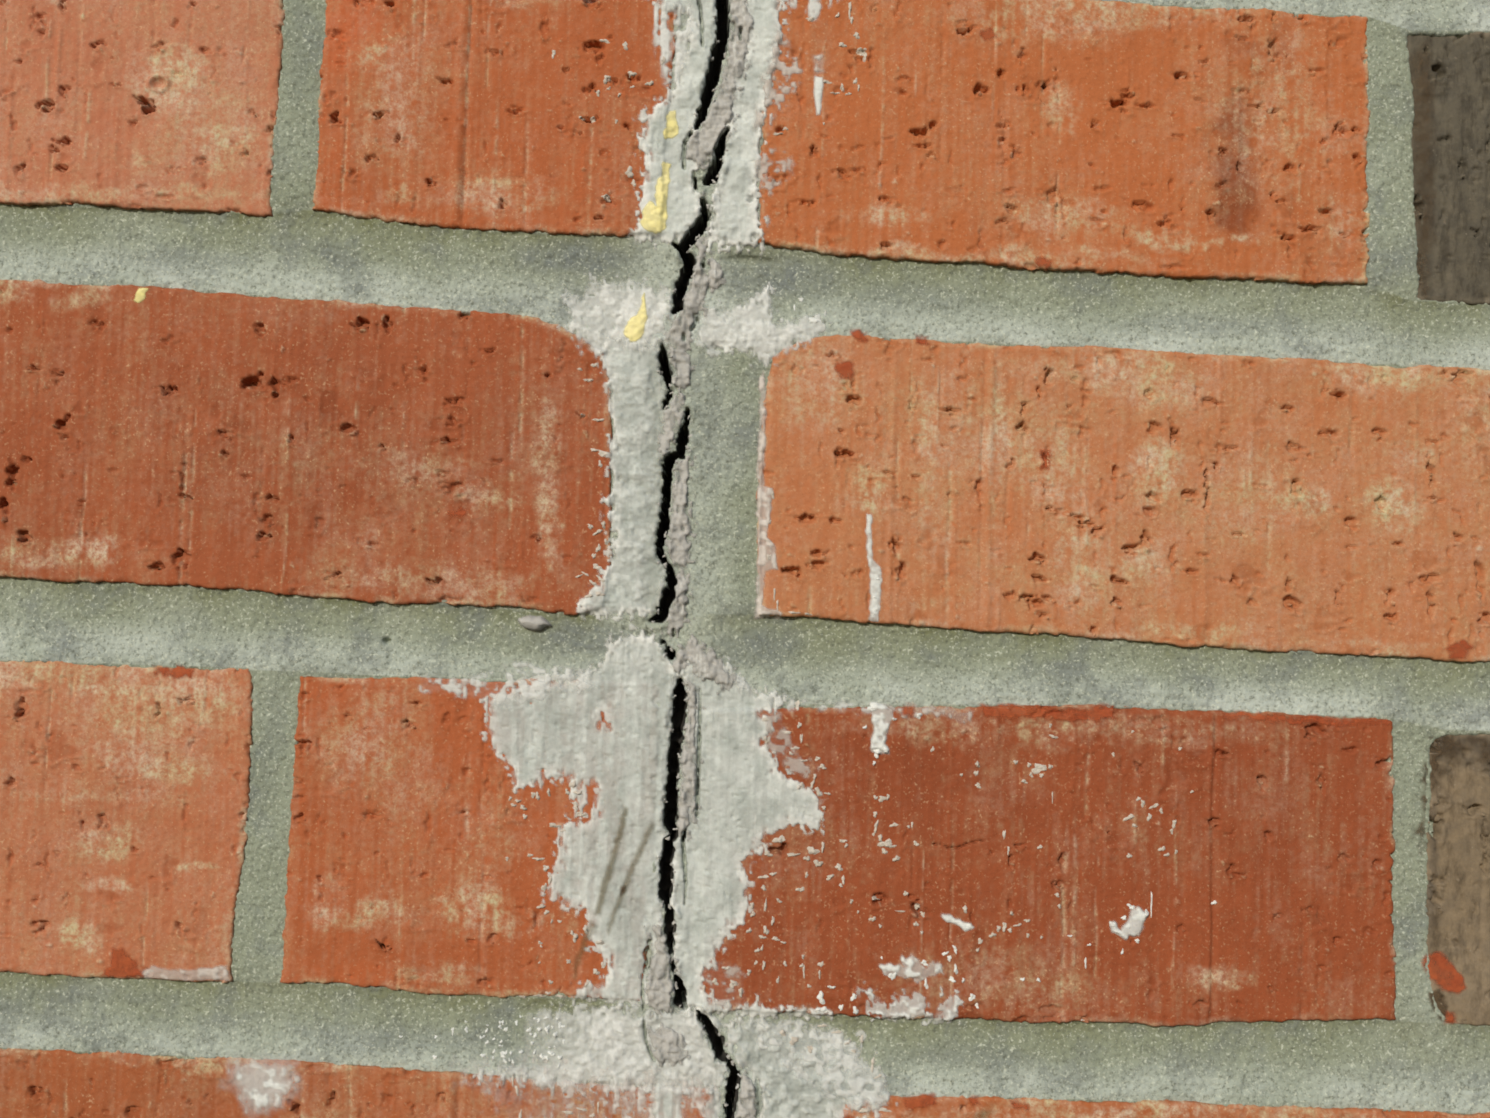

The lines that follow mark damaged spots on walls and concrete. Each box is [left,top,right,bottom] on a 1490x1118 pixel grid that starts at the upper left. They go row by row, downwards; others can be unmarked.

crack [641,0,758,1118]